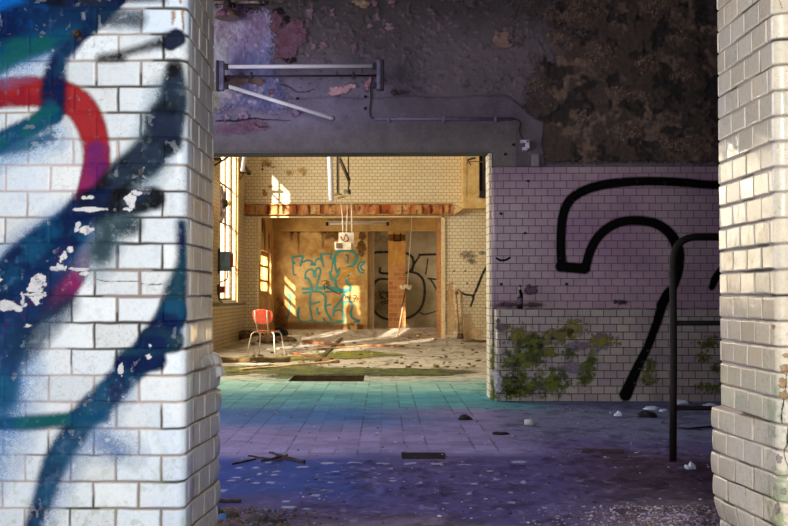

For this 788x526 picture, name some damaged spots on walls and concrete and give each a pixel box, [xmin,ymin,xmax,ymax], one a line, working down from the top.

peeling [350,0,396,31]
peeling [212,0,337,121]
peeling [328,74,372,96]
peeling [508,0,720,164]
peeling [73,195,108,212]
peeling [123,190,143,212]
peeling [74,222,95,235]
peeling [0,246,90,312]
crack [780,375,788,465]